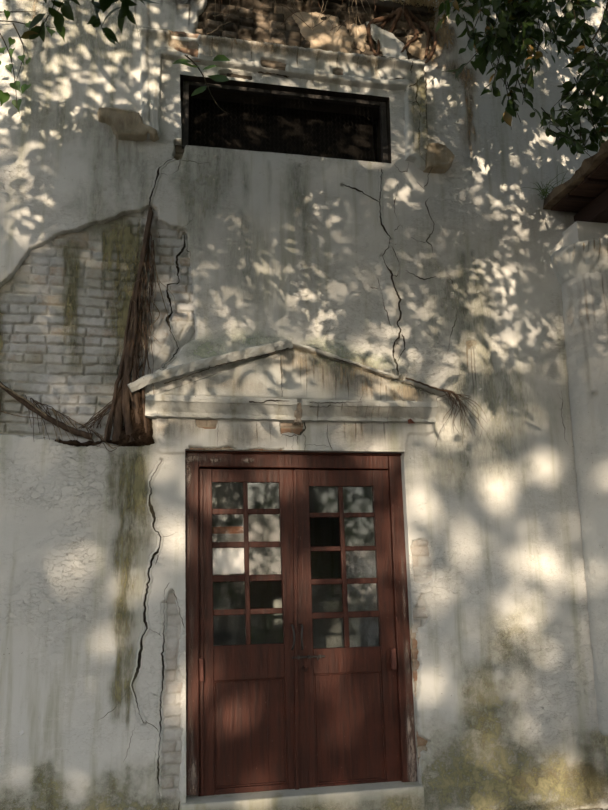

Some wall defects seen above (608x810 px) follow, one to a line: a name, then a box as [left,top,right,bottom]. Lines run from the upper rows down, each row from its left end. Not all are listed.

flaking render [169,0,436,63]
flaking render [0,207,195,443]
crack [147,157,209,206]
crack [162,211,289,403]
crack [334,61,458,398]
crack [279,397,362,451]
crack [97,460,184,810]
leakage [511,748,607,810]